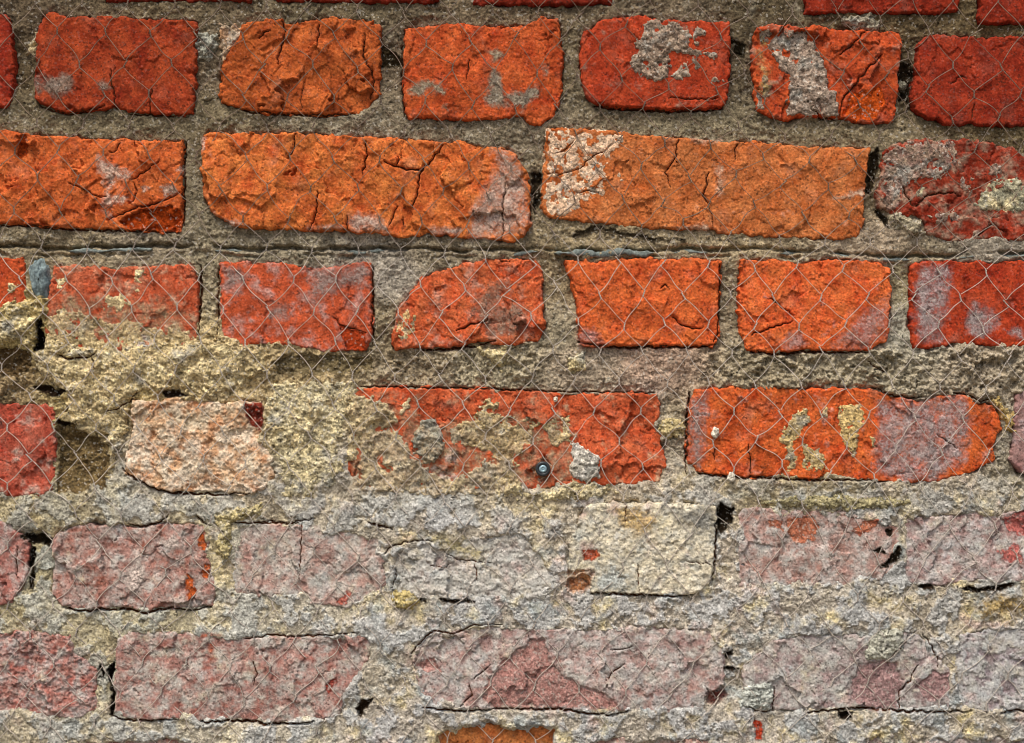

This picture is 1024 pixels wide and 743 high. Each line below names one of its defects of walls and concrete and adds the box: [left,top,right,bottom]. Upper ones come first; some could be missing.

crack [259,21,286,62]
crack [243,37,375,157]
crack [362,143,443,225]
crack [544,141,611,193]
damp [540,127,623,220]
peeling [541,415,572,447]
flaking render [779,404,876,472]